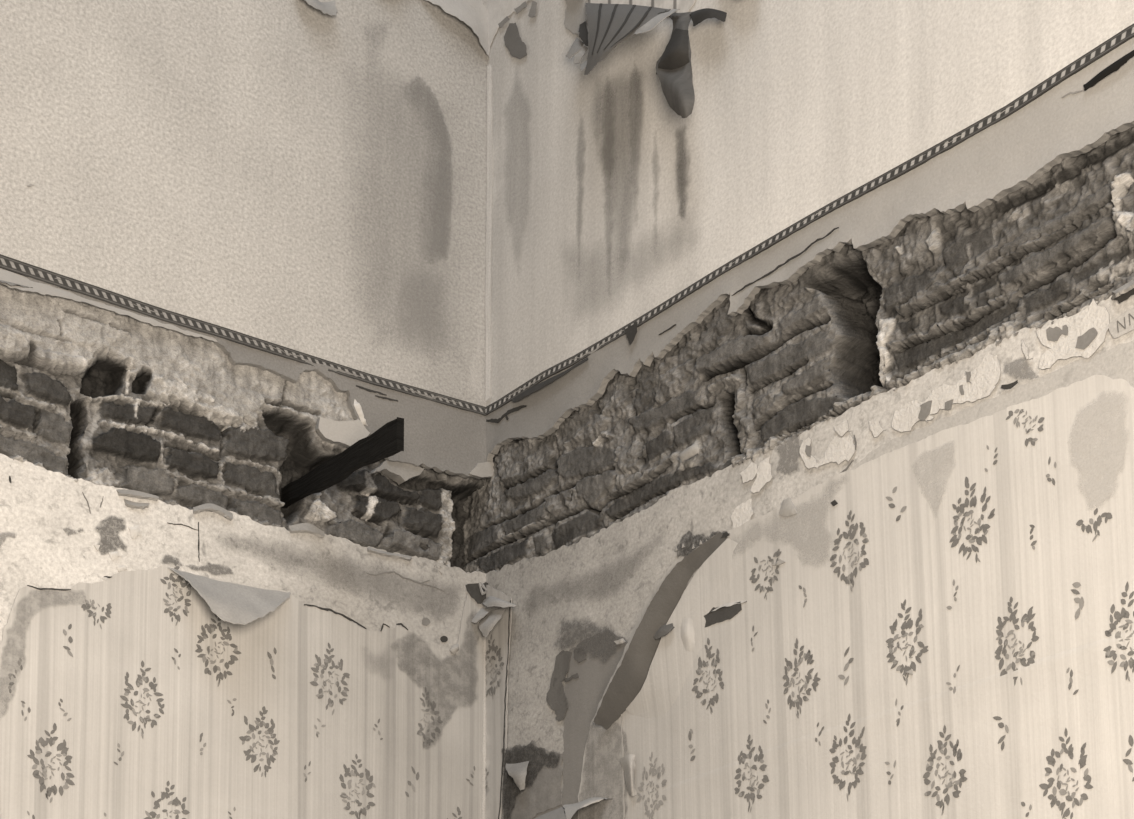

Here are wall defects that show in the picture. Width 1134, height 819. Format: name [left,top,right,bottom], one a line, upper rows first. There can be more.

peeling [504,23,527,59]
leakage [677,142,685,210]
flaking render [0,127,1134,575]